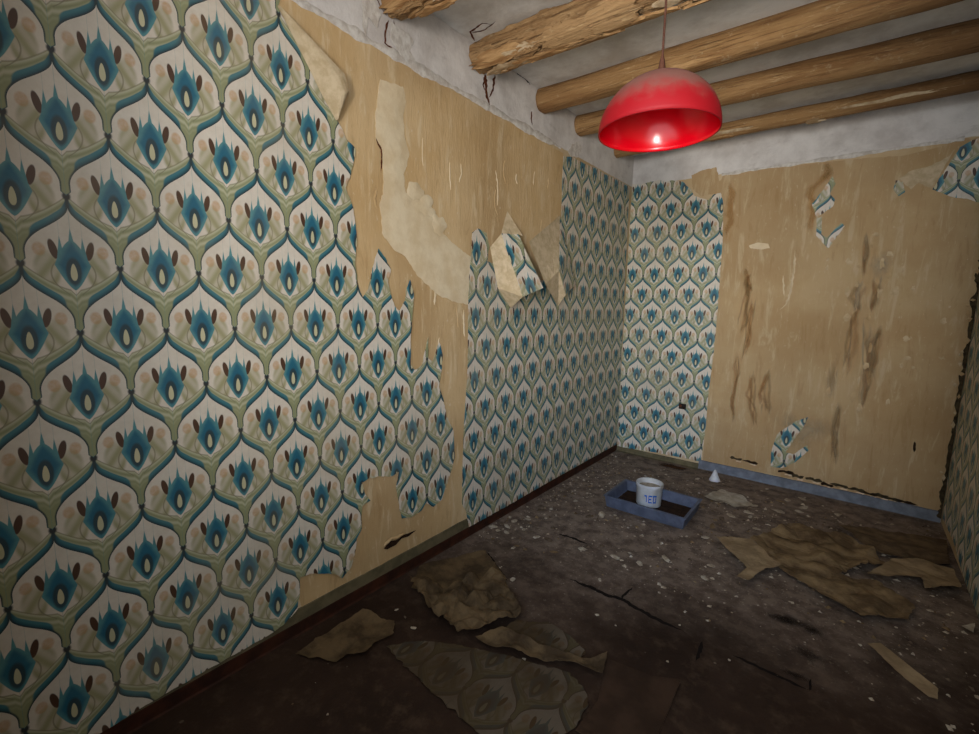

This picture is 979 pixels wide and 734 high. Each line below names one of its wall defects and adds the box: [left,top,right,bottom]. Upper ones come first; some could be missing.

peeling [278,0,563,606]
peeling [692,137,979,511]